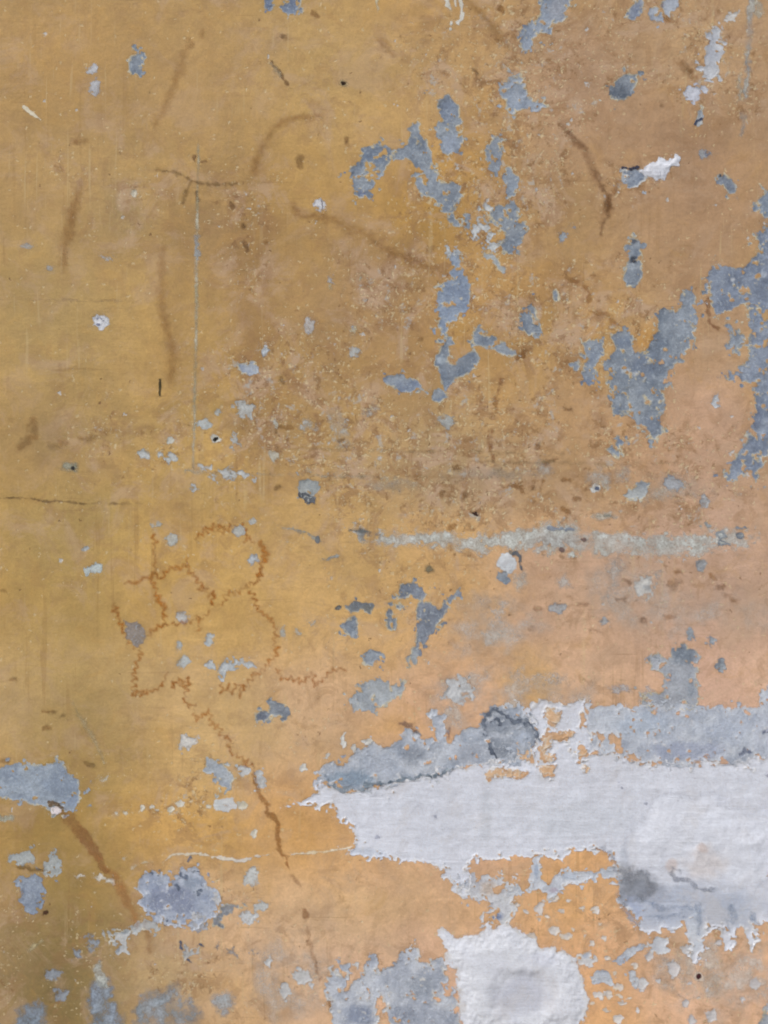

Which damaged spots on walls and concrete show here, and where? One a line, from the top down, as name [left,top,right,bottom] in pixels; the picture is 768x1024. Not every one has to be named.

peeling [614,155,681,194]
peeling [714,172,738,200]
peeling [338,90,543,430]
peeling [567,183,768,489]
peeling [335,577,463,716]
peeling [0,754,109,821]
crack [131,851,276,870]
spalling [277,627,768,1024]
flaking render [69,854,275,1024]